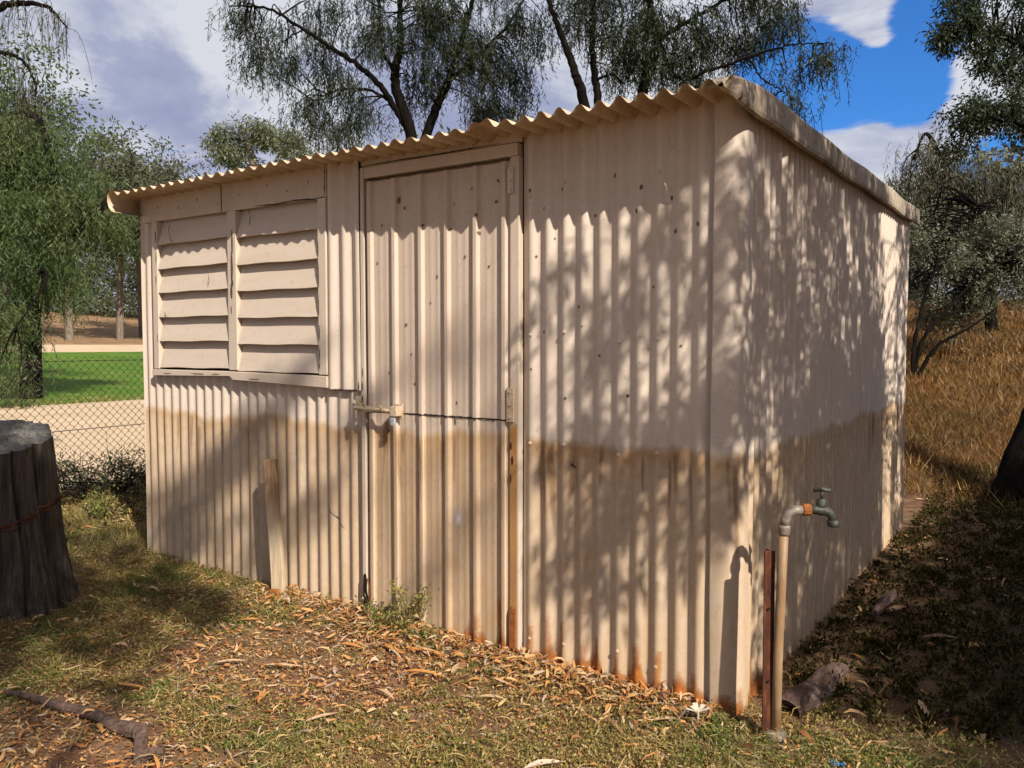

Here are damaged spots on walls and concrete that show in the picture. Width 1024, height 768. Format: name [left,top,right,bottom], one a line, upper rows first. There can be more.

rust [462,604,505,653]
rust [529,628,762,716]